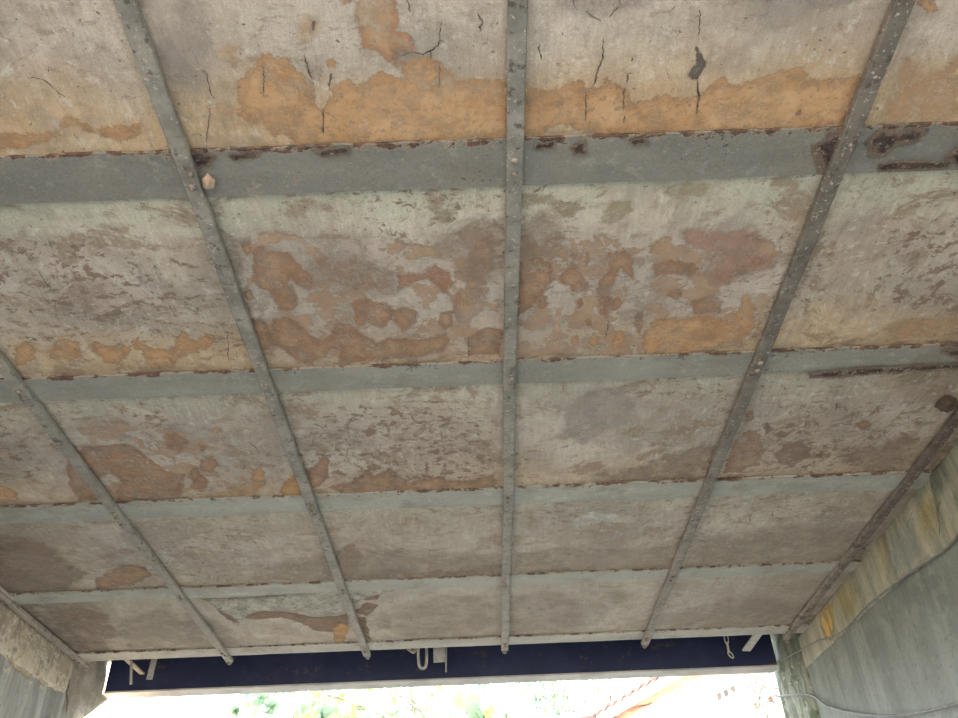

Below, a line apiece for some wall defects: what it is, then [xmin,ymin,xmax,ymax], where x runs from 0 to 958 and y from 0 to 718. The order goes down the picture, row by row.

crack [572,0,623,122]
crack [622,57,633,123]
rust [524,66,860,174]
spalling [688,47,707,79]
crack [694,81,702,115]
rust [852,126,958,172]
rust [808,348,958,379]
rust [732,402,925,472]